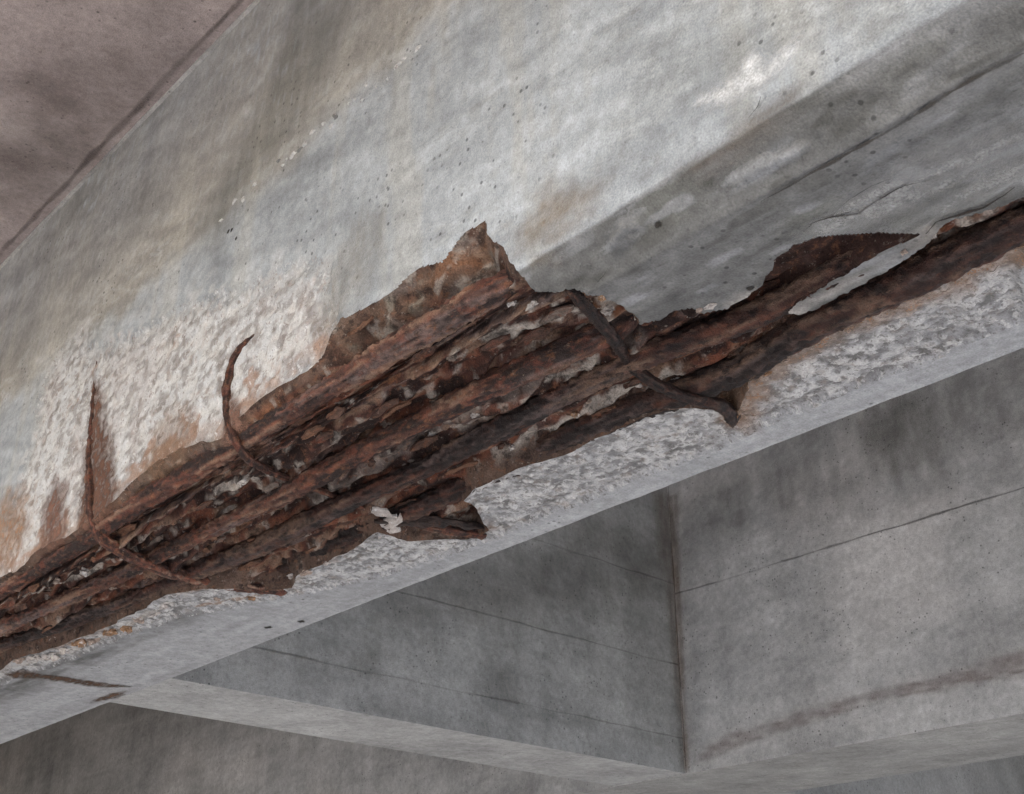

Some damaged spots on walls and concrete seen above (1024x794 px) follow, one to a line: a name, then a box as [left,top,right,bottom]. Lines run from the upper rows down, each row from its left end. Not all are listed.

peeling [276,113,338,167]
crack [801,177,927,235]
crack [926,187,1015,234]
corrosion [0,205,1024,653]
spalling [0,197,1024,685]
corrosion [6,670,130,702]